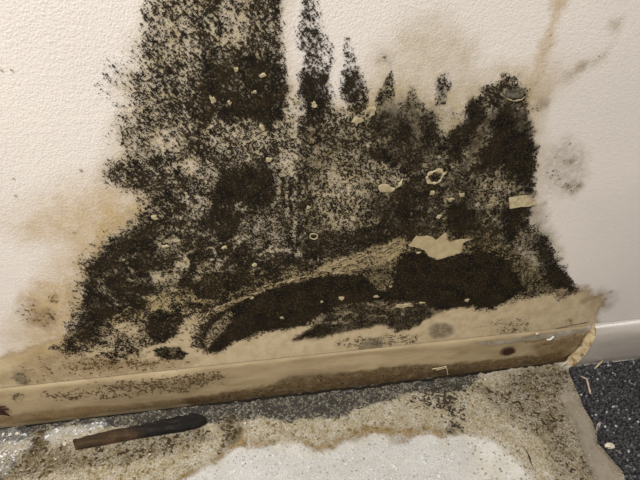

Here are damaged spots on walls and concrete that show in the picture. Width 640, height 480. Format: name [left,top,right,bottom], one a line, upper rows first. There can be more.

leakage [0,0,603,401]
peeling [374,179,403,193]
peeling [509,195,536,209]
spalling [243,233,473,300]
leakage [0,363,611,480]